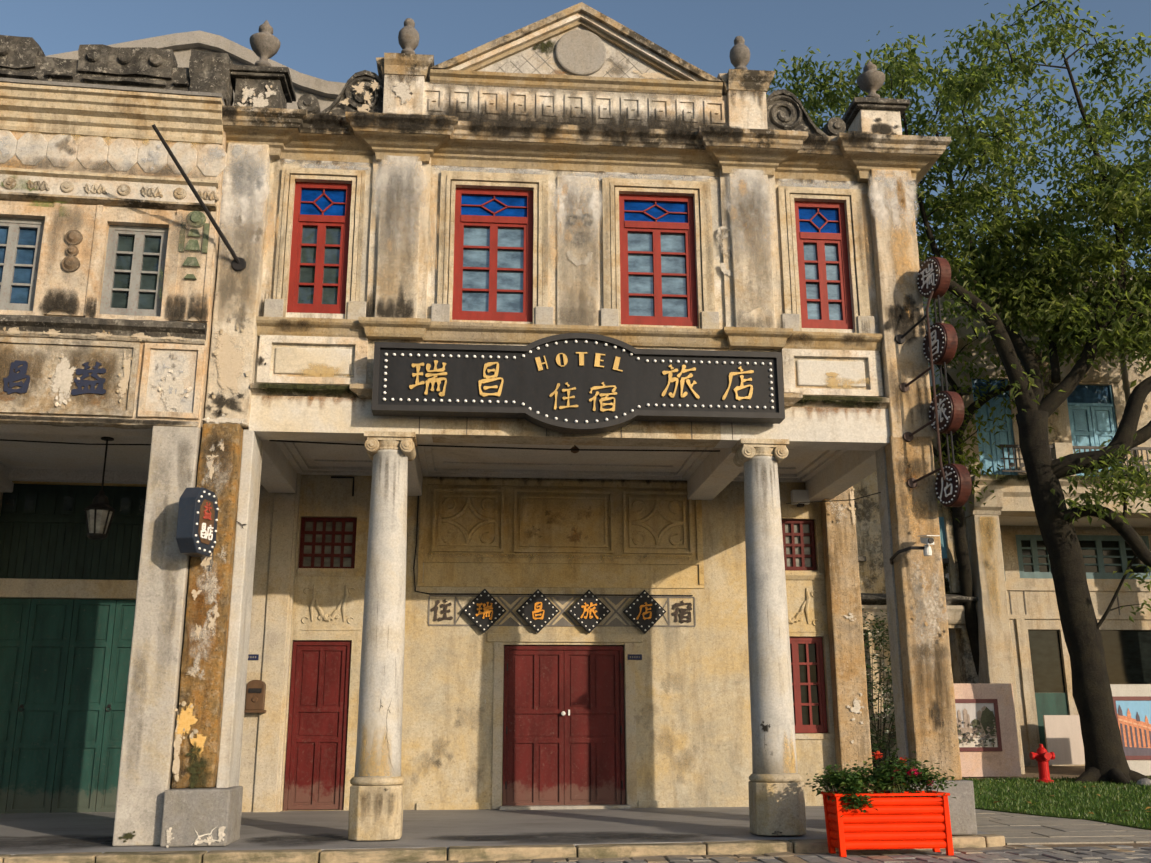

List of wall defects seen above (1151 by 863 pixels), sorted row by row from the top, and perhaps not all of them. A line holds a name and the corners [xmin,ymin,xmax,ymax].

peeling [237,85,276,107]
water stain [210,103,940,189]
water stain [40,292,96,318]
water stain [161,294,208,323]
water stain [884,295,927,342]
peeling [49,353,80,406]
peeling [117,350,133,403]
peeling [131,332,192,412]
peeling [206,442,227,496]
peeling [185,550,225,678]
peeling [172,701,207,782]